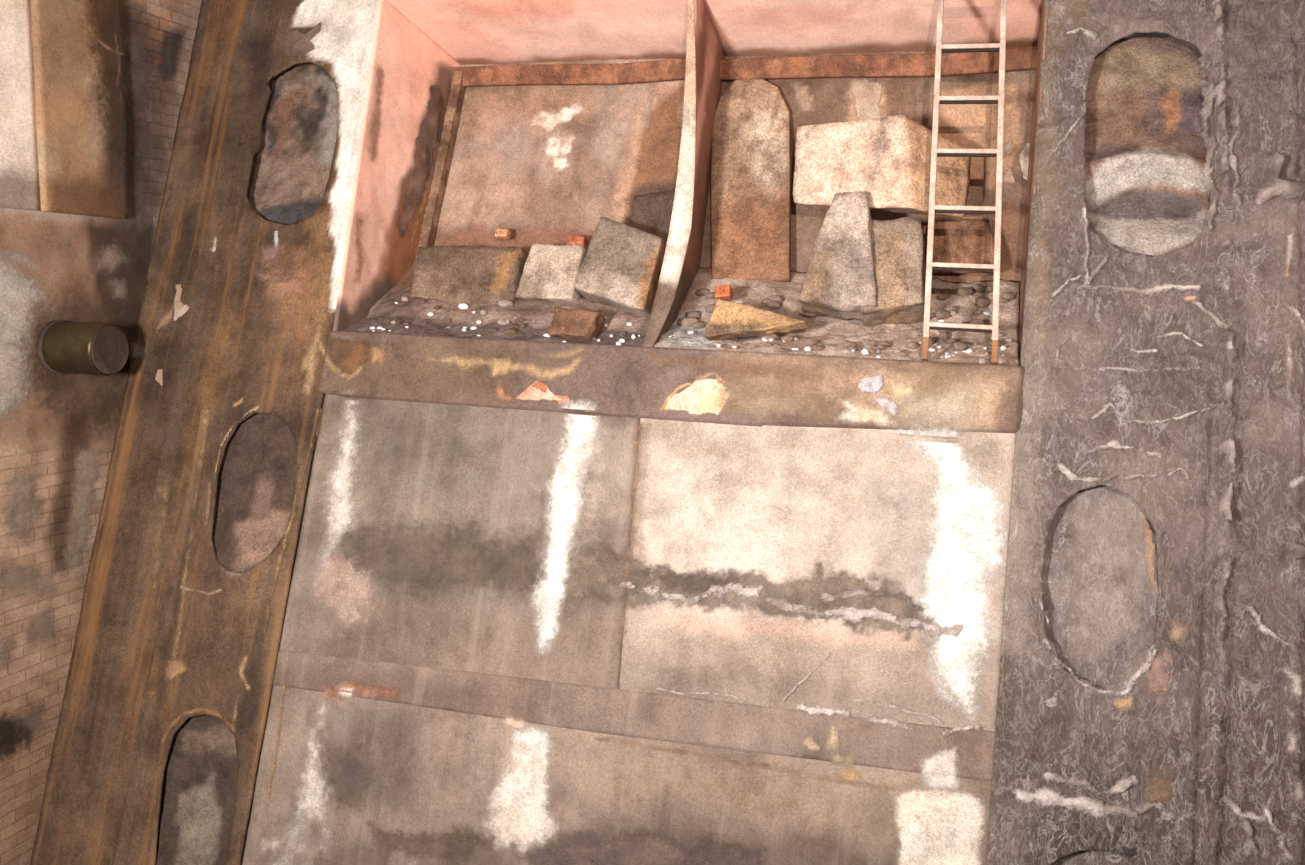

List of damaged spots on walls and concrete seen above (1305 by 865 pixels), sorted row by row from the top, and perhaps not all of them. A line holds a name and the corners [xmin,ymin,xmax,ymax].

leakage [499,104,582,170]
leakage [591,87,655,181]
peeling [496,381,570,405]
peeling [660,373,824,417]
peeling [841,375,970,426]
leakage [315,400,1006,865]